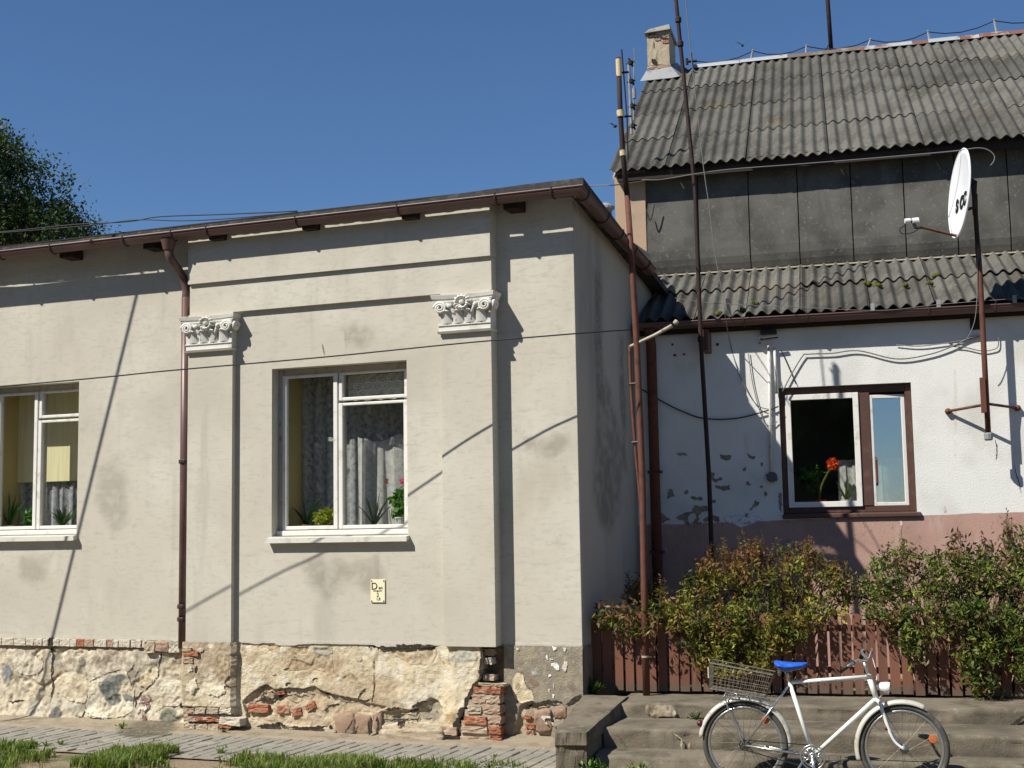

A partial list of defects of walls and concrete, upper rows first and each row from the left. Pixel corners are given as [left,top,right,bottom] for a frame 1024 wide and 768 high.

peeling [661,472,730,526]
peeling [743,454,783,517]
spalling [0,638,443,736]
flaking render [460,646,567,741]